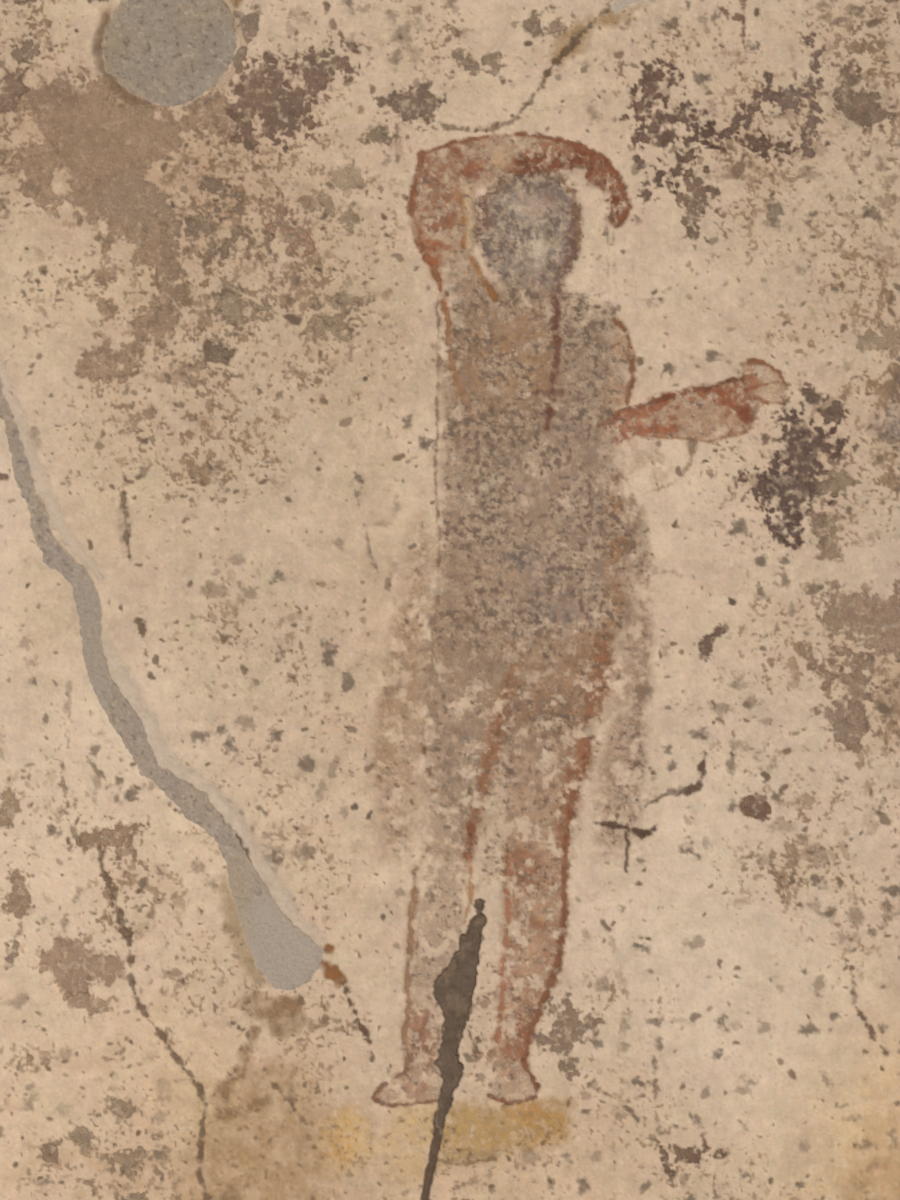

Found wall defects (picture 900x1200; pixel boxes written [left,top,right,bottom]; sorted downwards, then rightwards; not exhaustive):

peeling [0,6,364,384]
crack [0,361,323,990]
peeling [0,790,19,826]
peeling [79,823,145,850]
peeling [2,870,30,918]
peeling [39,937,124,1015]
crack [98,846,211,1200]
crack [344,987,374,1062]
crack [421,1111,443,1200]